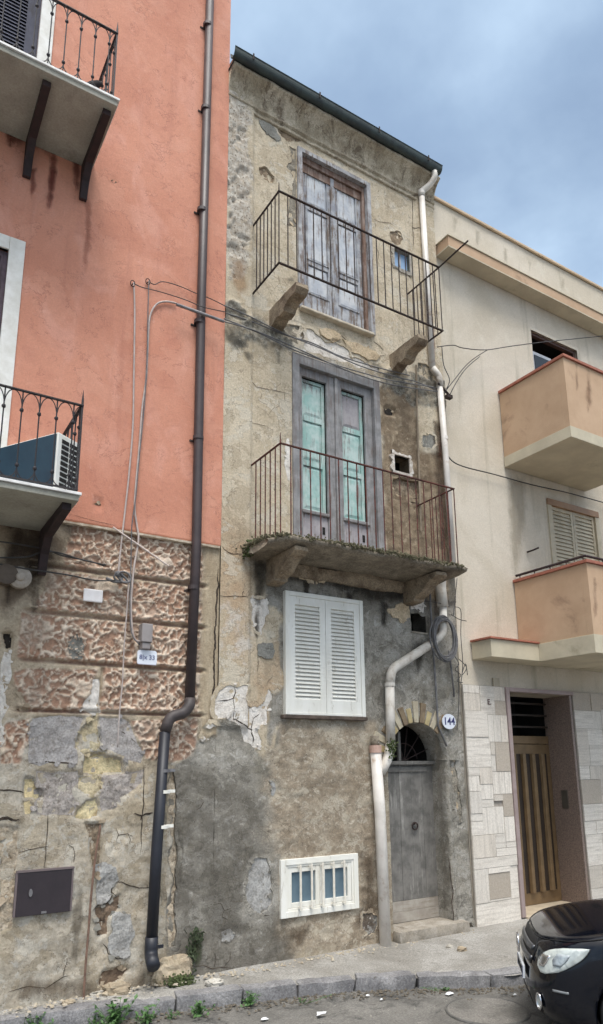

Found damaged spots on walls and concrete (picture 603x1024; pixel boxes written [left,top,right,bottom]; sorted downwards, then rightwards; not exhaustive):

rust [48,157,56,205]
flaking render [280,321,382,376]
flaking render [387,597,428,623]
crack [212,576,259,742]
flaking render [198,680,277,753]
spalling [0,634,145,880]
crack [116,770,153,853]
crack [95,881,149,908]
spalling [241,852,277,919]